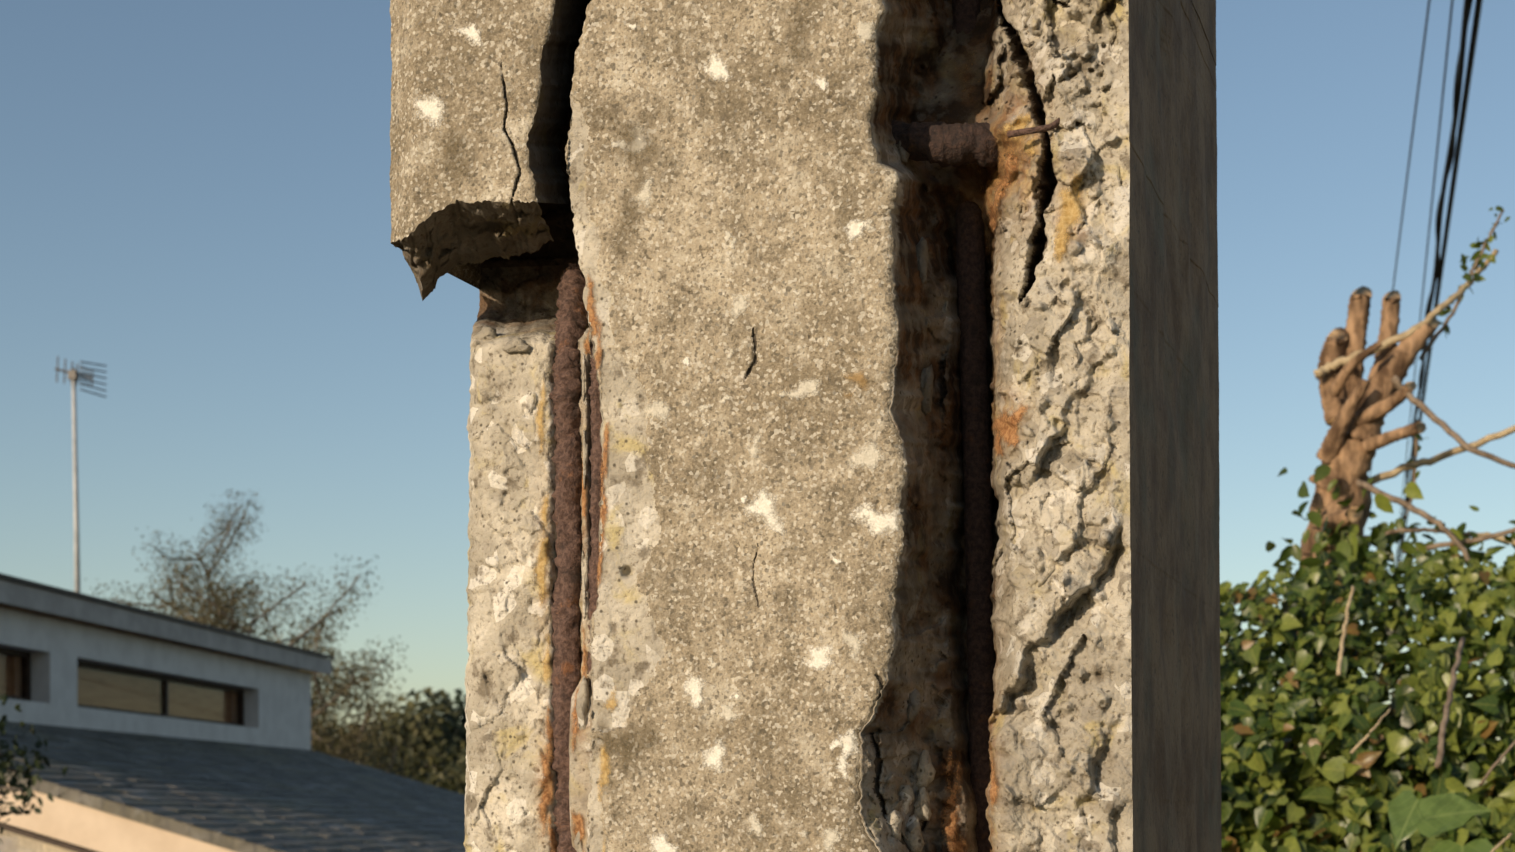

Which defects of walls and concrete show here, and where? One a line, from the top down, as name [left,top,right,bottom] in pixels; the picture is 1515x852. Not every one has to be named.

crack [1053,0,1070,8]
crack [481,0,591,268]
corrosion [969,115,1035,256]
crack [998,1,1058,303]
corrosion [584,277,602,369]
spalling [463,94,666,852]
corrosion [582,423,608,586]
spalling [858,0,1133,852]
corrosion [993,406,1027,456]
corrosion [539,708,585,852]
corrosion [941,754,965,852]
corrosion [989,760,997,804]